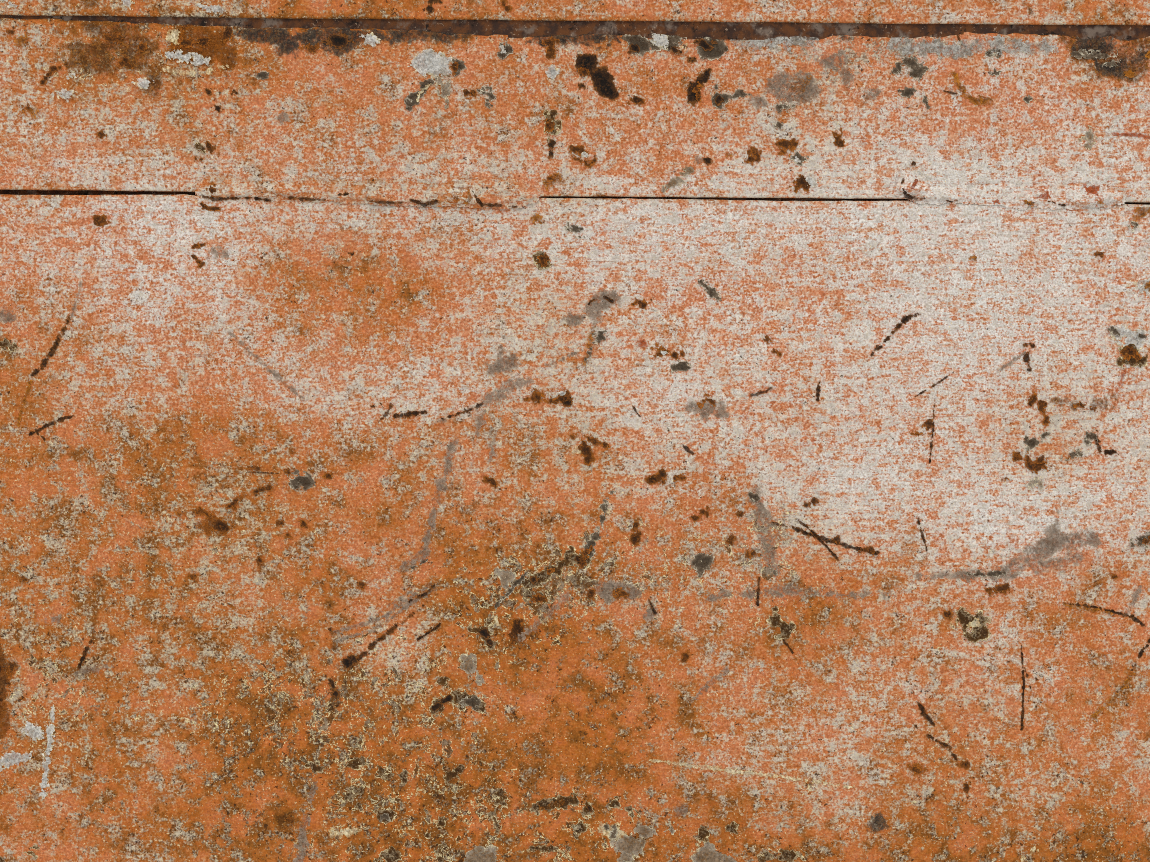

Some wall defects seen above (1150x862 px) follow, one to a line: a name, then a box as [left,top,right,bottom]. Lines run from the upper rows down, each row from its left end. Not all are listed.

rust [1058,35,1150,83]
rust [621,95,645,107]
rust [629,520,646,546]
rust [982,582,1010,598]
rust [507,618,525,645]
rust [0,647,17,738]
peeling [443,764,466,786]
peeling [343,752,412,826]
peeling [463,784,508,862]
peeling [529,789,688,862]
peeling [373,846,403,862]
peeling [690,841,737,862]